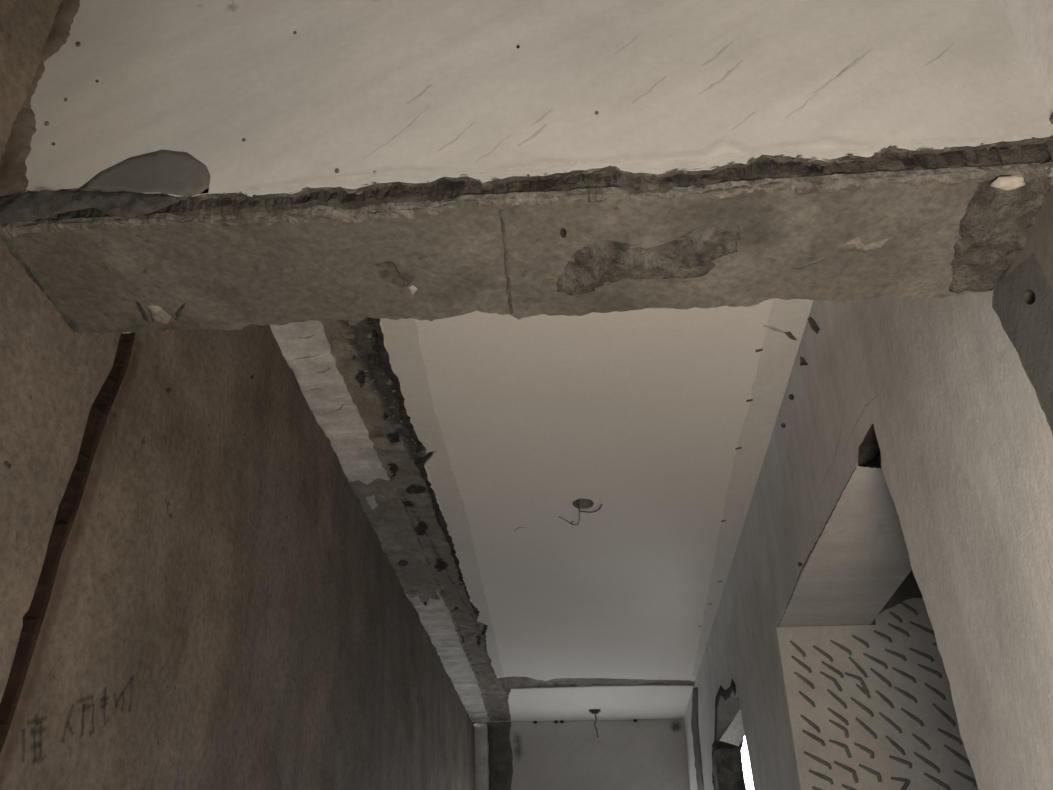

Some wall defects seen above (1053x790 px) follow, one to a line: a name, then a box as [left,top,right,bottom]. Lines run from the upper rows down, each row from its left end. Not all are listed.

spalling [0,137,1053,238]
spalling [136,302,186,324]
spalling [375,261,418,295]
spalling [556,225,741,298]
peeling [319,317,746,790]